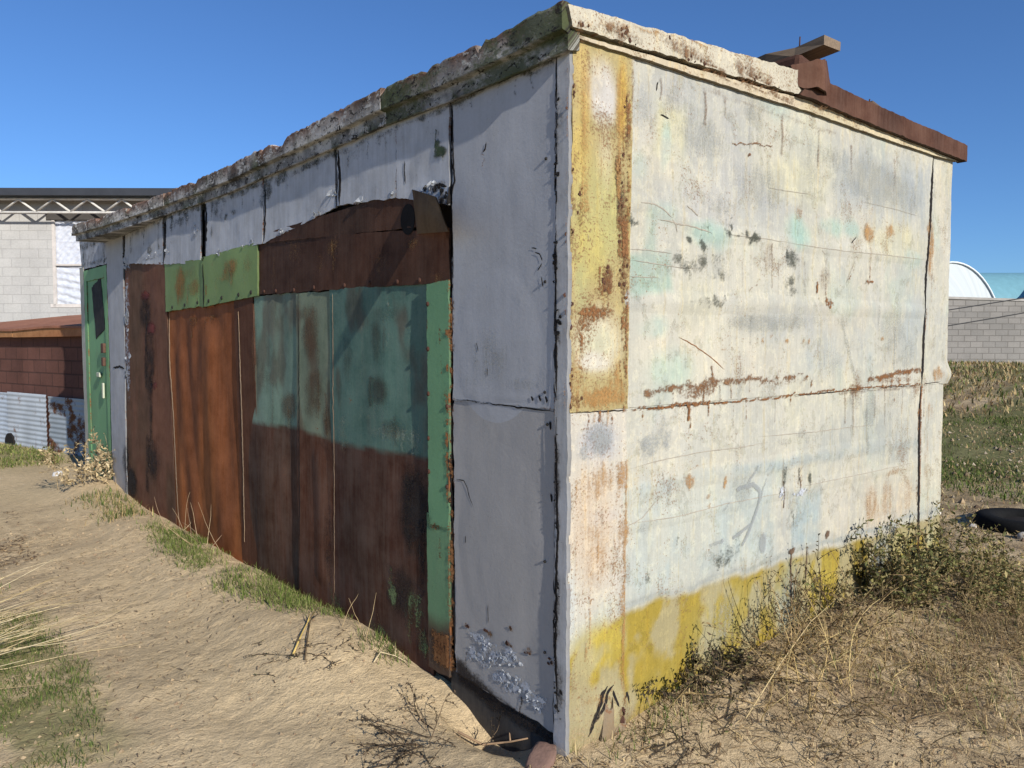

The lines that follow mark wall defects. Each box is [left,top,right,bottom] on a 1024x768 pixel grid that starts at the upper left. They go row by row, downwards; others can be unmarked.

corrosion [125,262,258,568]
corrosion [394,364,456,672]
corrosion [439,290,454,352]
corrosion [570,77,942,544]
damp [456,659,553,741]